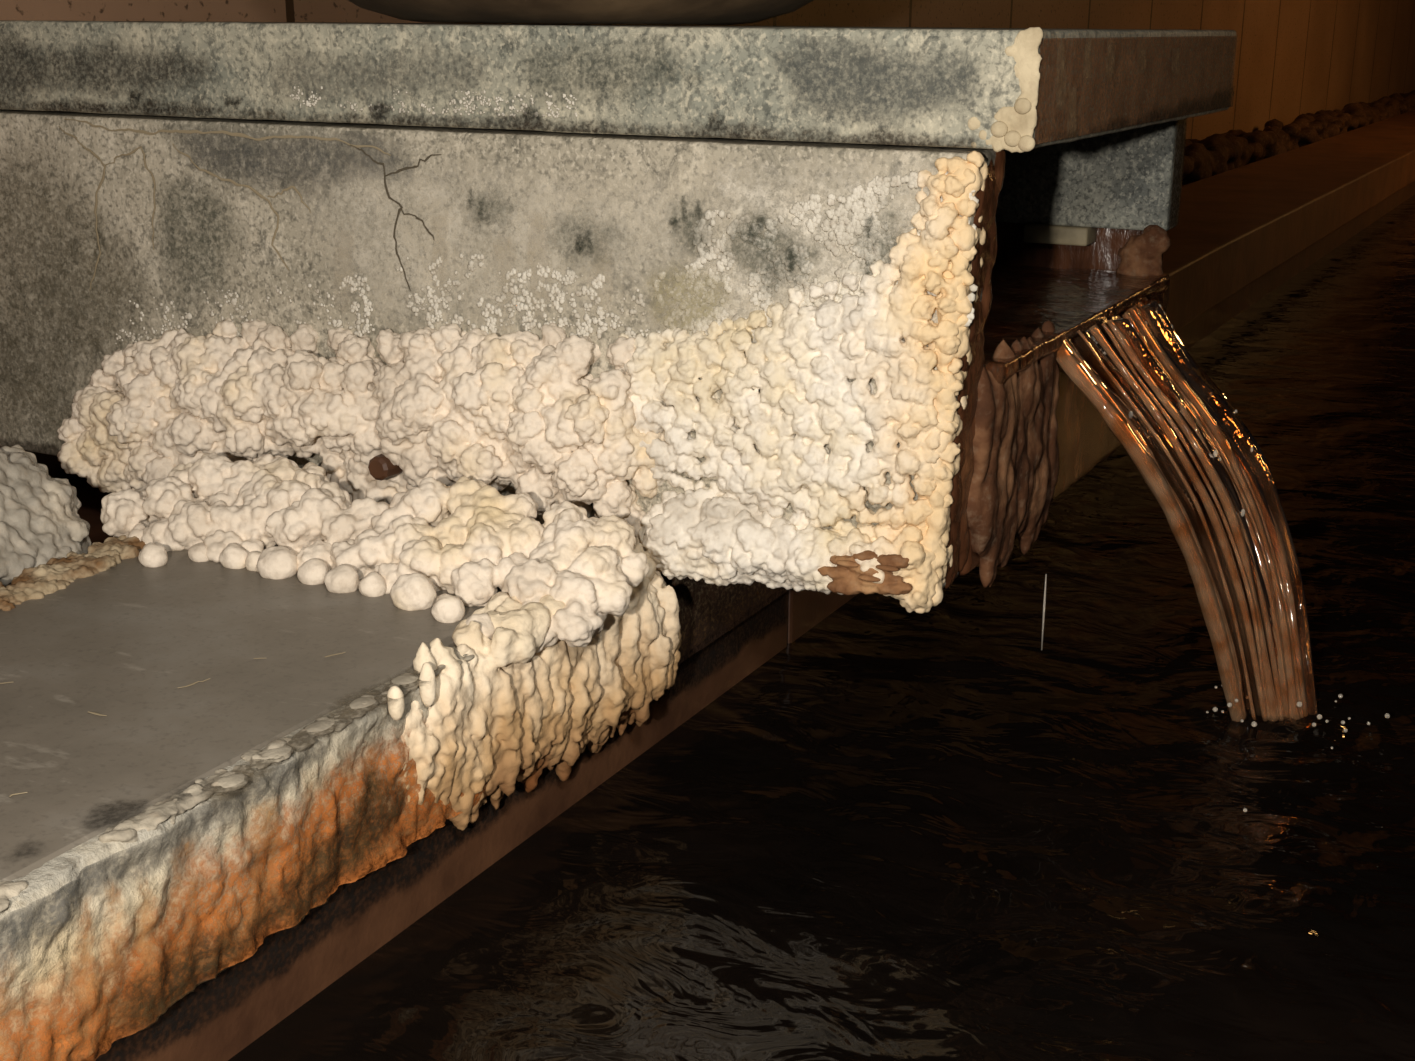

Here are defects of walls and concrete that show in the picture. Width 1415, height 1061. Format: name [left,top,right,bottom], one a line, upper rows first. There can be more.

damp [0,40,204,94]
damp [289,86,323,108]
crack [350,145,441,290]
damp [339,58,672,118]
damp [782,40,969,118]
damp [968,27,1237,276]
damp [993,320,1055,359]
damp [966,351,1059,588]
damp [0,135,988,1061]
corrosion [0,742,486,1061]